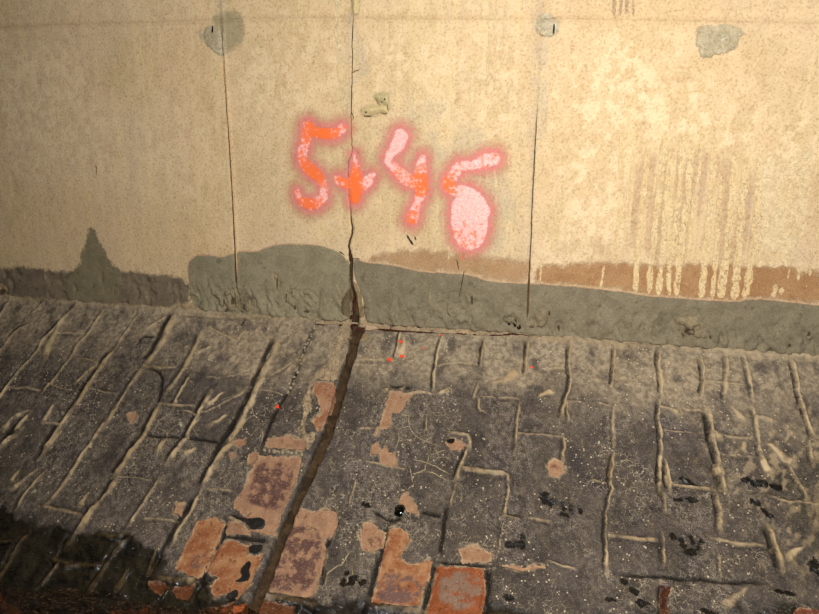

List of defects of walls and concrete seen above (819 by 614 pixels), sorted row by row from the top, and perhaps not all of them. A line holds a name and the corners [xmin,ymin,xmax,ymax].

crack [223,65,237,283]
crack [249,15,542,614]
water stain [0,132,819,356]
peeling [148,324,352,614]
peeling [371,391,414,467]
peeling [360,521,492,614]
peeling [793,606,819,614]